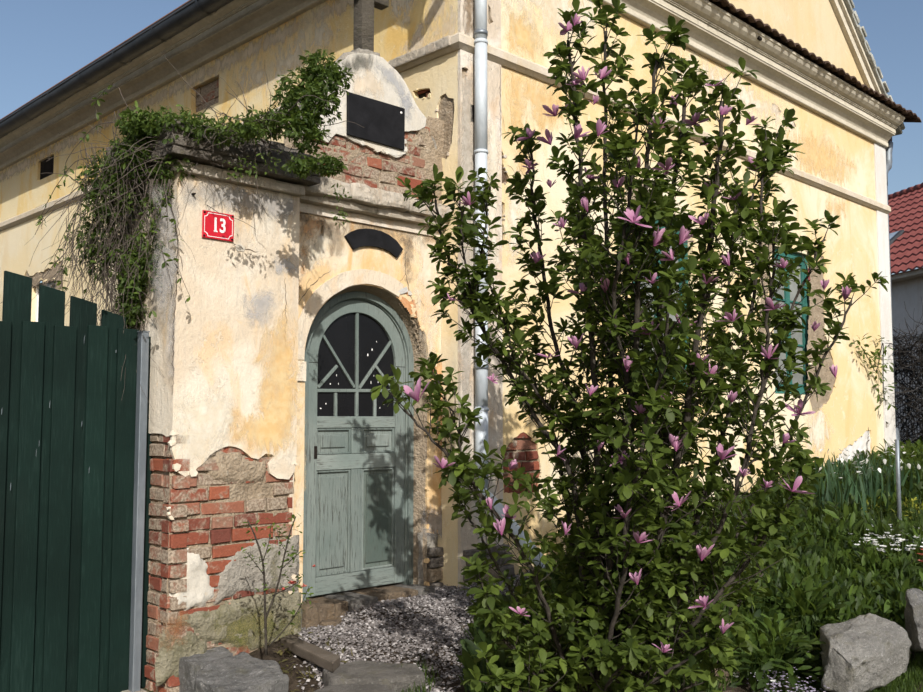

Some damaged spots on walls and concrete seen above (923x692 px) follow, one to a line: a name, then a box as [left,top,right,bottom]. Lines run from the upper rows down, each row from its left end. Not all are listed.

flaking render [284,89,454,204]
flaking render [503,432,542,494]
flaking render [839,429,872,464]
flaking render [145,430,301,692]